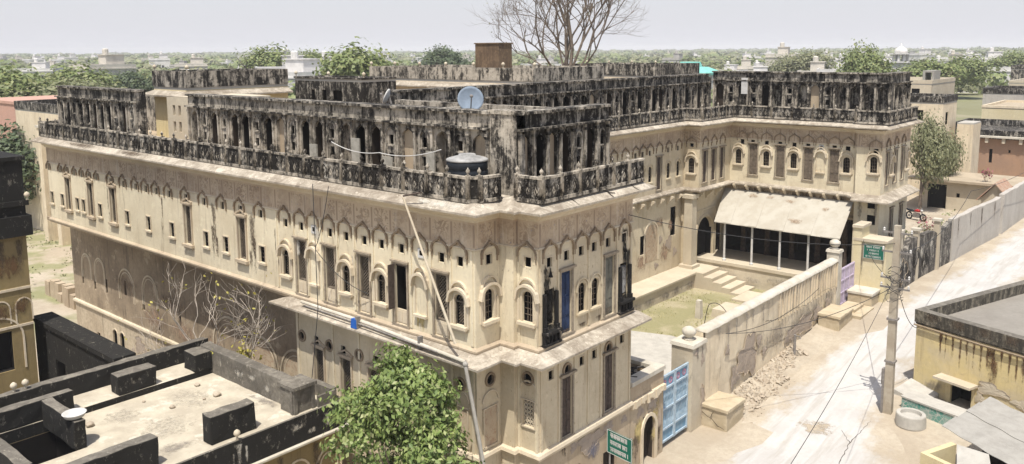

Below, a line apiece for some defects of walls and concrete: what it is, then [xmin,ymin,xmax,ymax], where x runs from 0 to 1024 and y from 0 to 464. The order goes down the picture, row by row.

flaking render [725,331,767,389]
leakage [928,315,1024,380]